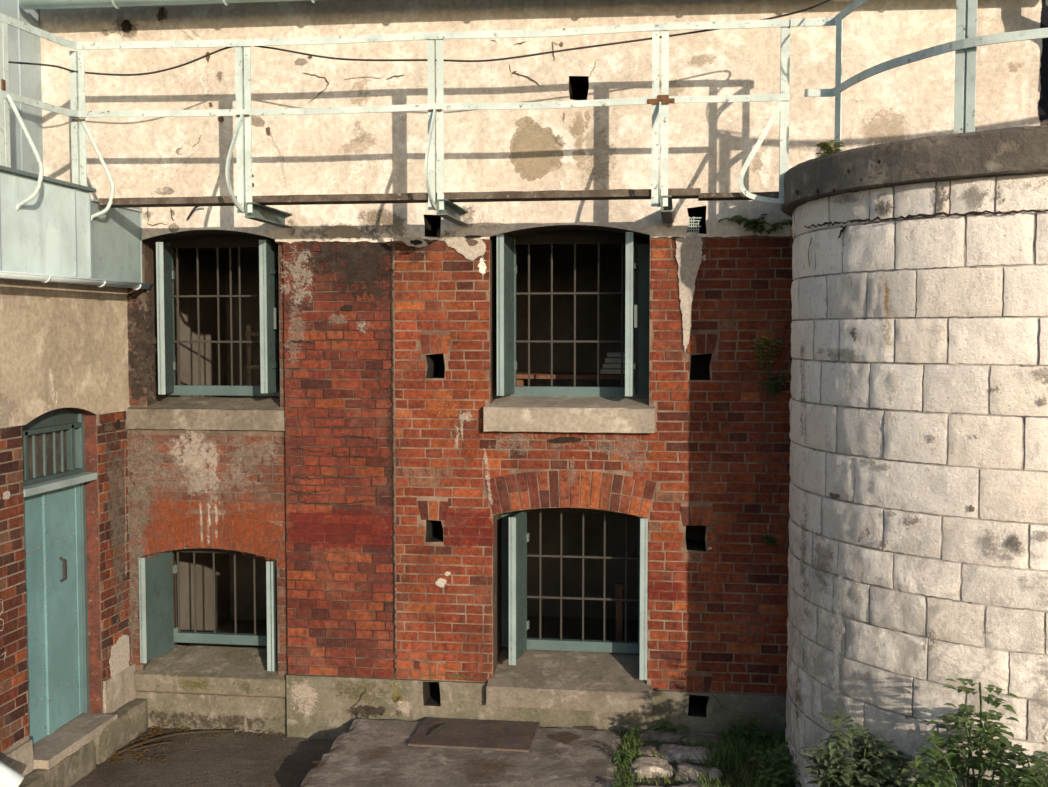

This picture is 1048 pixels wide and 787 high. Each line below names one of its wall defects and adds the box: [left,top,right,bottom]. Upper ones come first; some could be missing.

crack [305,73,402,101]
crack [492,40,563,101]
peeling [511,117,563,181]
damp [559,111,590,190]
spalling [445,235,487,274]
crack [791,209,1048,267]
rust [879,277,891,345]
peeling [109,593,131,677]